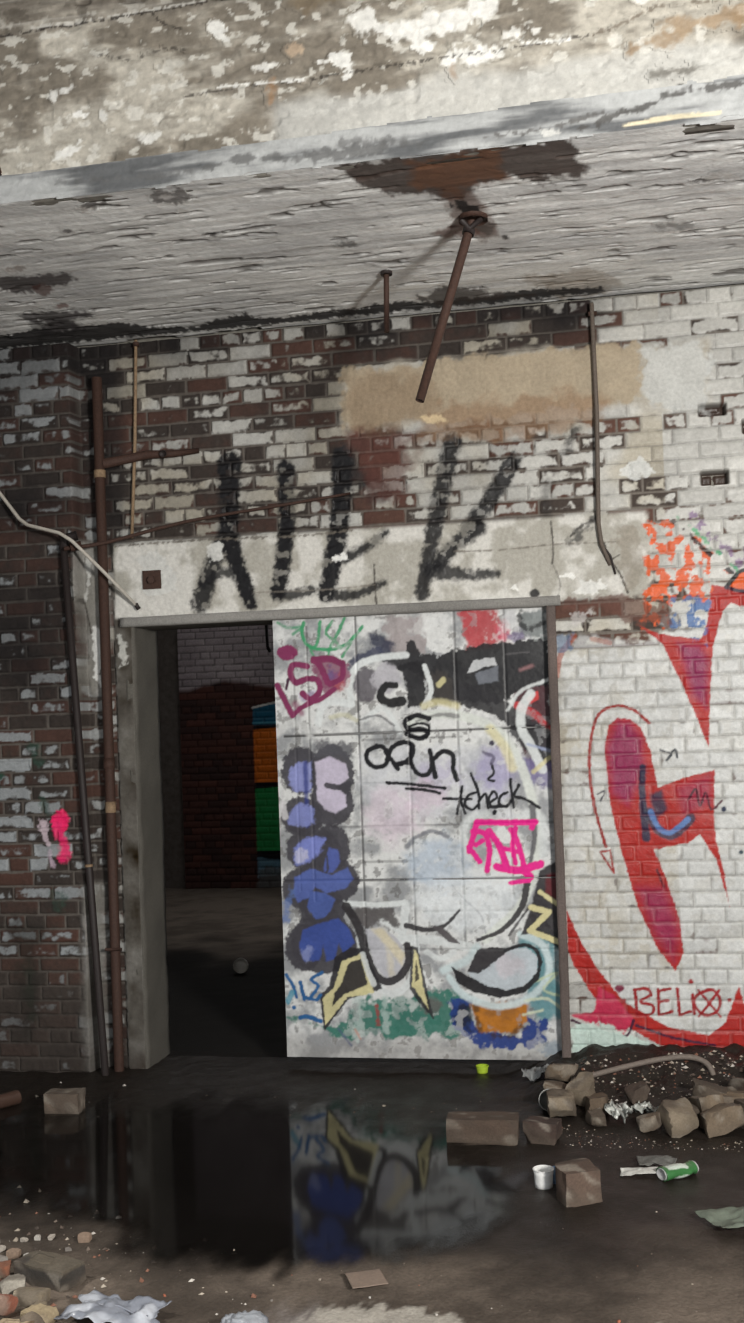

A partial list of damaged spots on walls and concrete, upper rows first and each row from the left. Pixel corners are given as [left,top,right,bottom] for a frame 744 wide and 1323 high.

peeling [206,18,231,45]
peeling [250,0,543,82]
peeling [154,57,186,75]
peeling [47,78,116,126]
peeling [137,128,164,146]
peeling [45,138,84,166]
corrosion [338,137,594,245]
corrosion [516,262,631,301]
peeling [618,454,657,482]